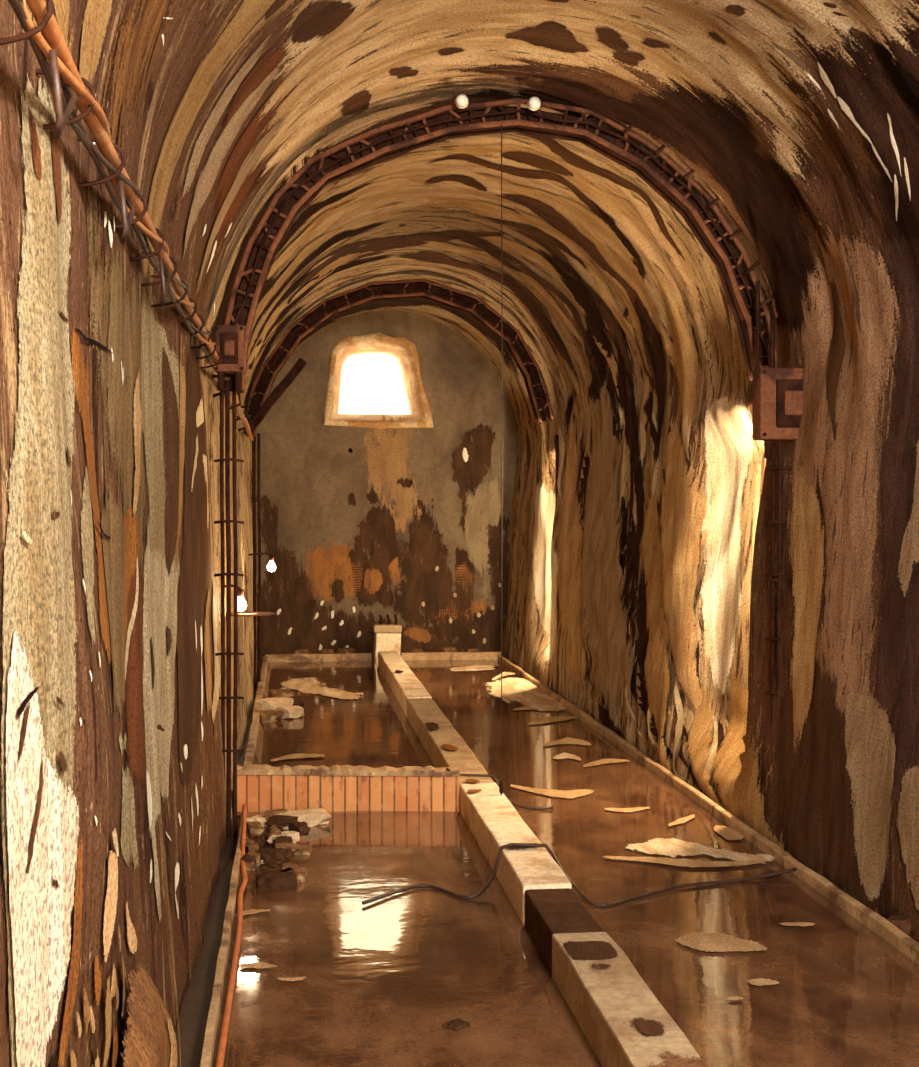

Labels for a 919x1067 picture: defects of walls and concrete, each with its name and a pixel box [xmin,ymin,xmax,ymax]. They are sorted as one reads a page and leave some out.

water stain [78,0,919,919]
rust [70,325,111,663]
flaking render [1,75,101,1067]
rust [300,540,401,604]
water stain [240,962,305,981]
water stain [563,941,619,969]
water stain [623,1017,665,1035]